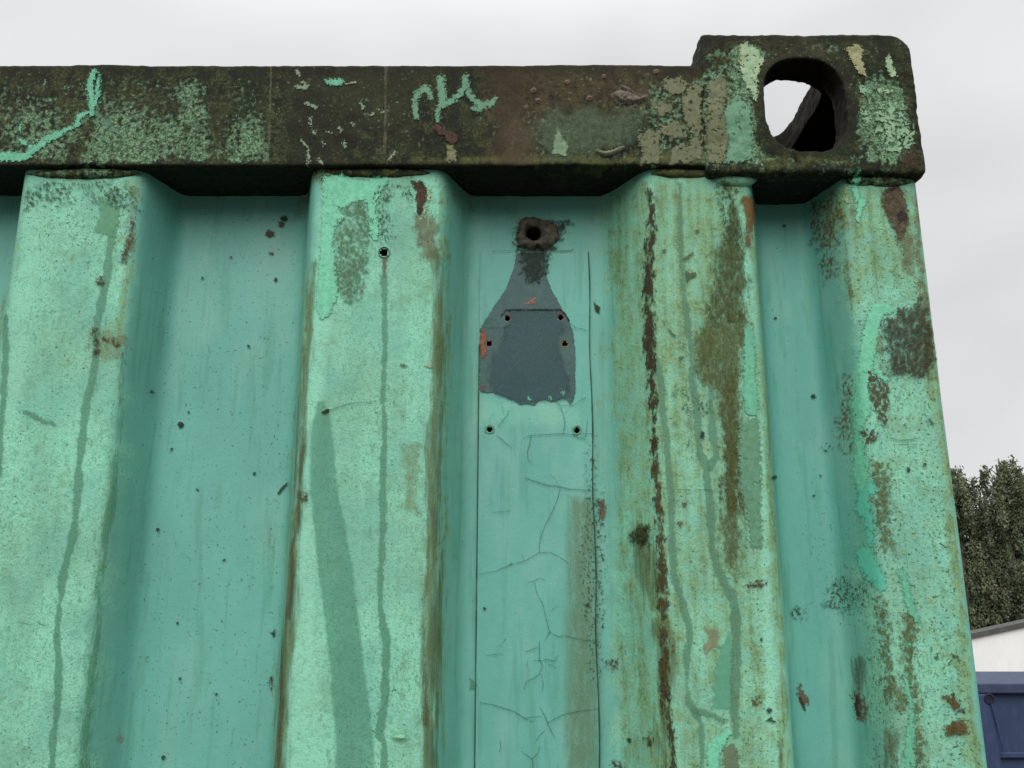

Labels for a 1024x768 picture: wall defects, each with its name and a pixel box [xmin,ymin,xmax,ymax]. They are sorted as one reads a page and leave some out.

peeling [0,68,122,162]
peeling [637,41,764,170]
peeling [844,44,916,160]
corrosion [91,327,119,355]
peeling [479,253,576,406]
damp [23,180,140,768]
corrosion [268,263,316,768]
corrosion [598,499,607,523]
corrosion [640,187,677,768]
damp [654,182,744,768]
corrosion [940,695,969,737]